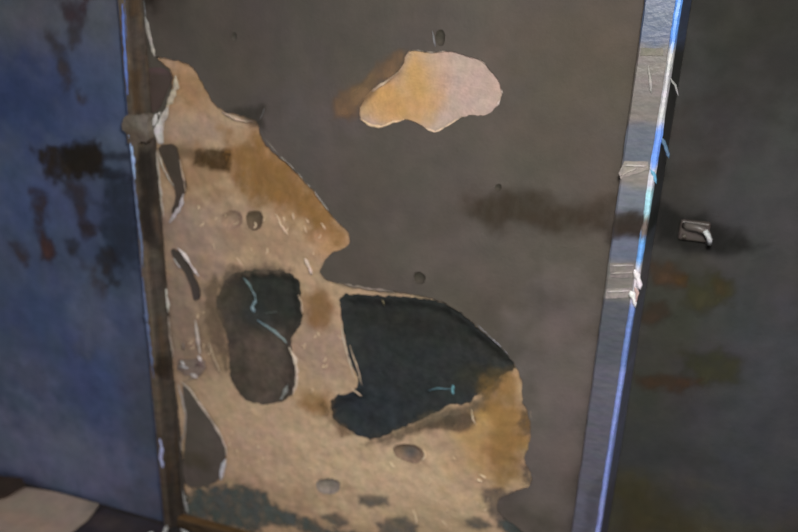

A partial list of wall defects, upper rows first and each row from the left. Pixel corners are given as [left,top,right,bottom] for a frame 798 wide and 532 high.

rust [39,144,128,236]
rust [137,151,156,242]
damp [656,205,747,252]
flaking render [144,2,532,532]
damp [186,484,353,532]
damp [359,496,388,506]
damp [377,518,416,532]
damp [467,519,489,529]